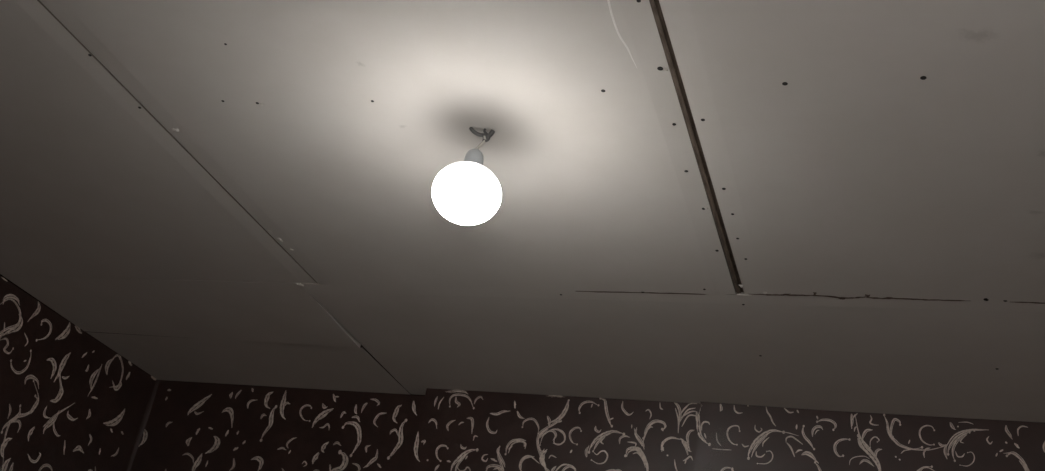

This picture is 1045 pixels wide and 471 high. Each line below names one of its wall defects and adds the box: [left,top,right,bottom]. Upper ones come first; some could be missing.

crack [753,292,965,301]